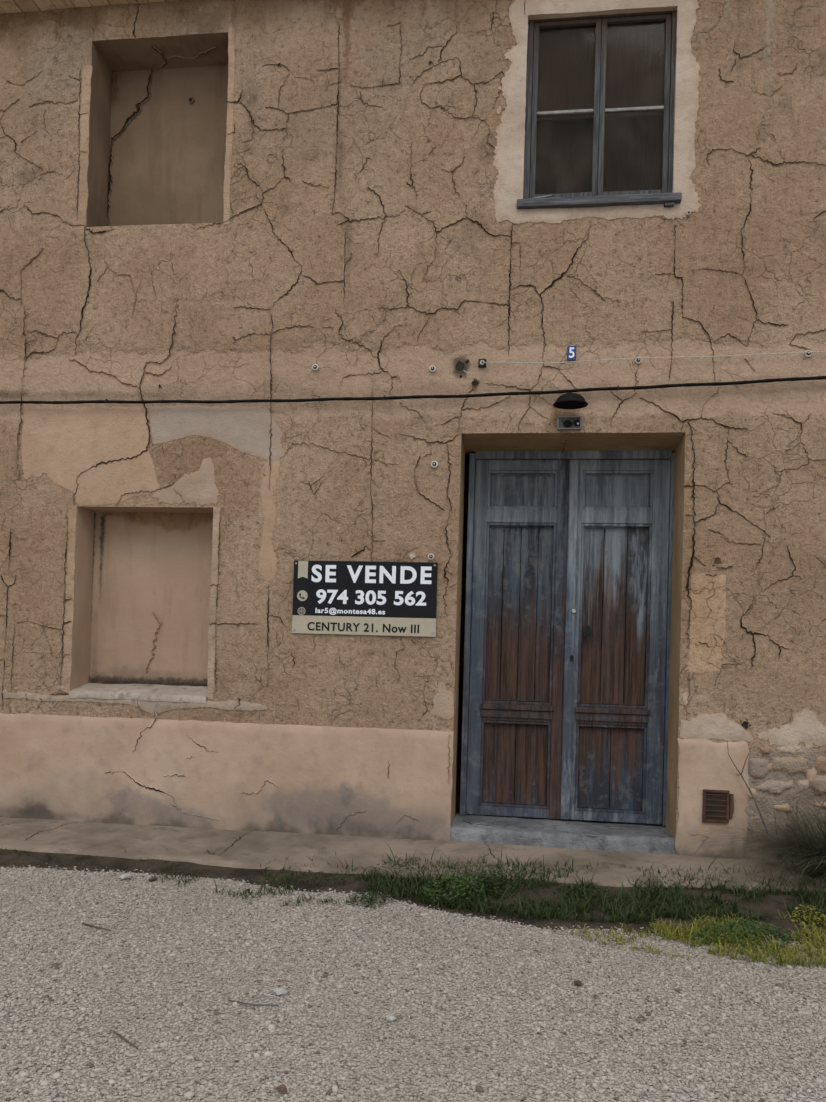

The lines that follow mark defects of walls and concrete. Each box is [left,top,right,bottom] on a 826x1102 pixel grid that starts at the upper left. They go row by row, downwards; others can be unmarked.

crack [718,44,798,97]
crack [0,0,217,710]
spalling [155,436,261,520]
crack [196,18,621,614]
crack [610,134,826,708]
crack [209,510,346,708]
crack [394,638,416,684]
crack [241,780,278,795]
spalling [680,709,826,863]